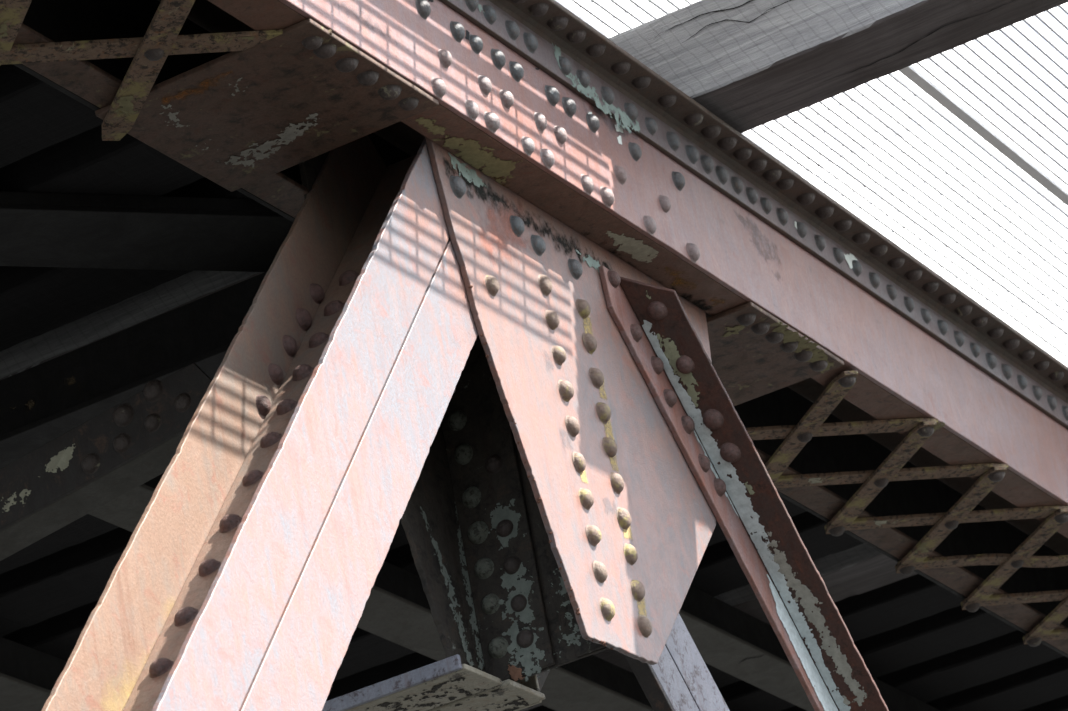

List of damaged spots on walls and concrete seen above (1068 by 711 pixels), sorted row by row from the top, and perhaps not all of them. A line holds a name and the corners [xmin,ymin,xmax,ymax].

crack [649,0,791,44]
crack [810,0,1015,87]
peeling [192,113,320,168]
peeling [412,117,522,184]
peeling [606,231,659,263]
peeling [38,444,76,477]
peeling [1,489,31,513]
peeling [642,320,867,711]
peeling [366,677,529,711]